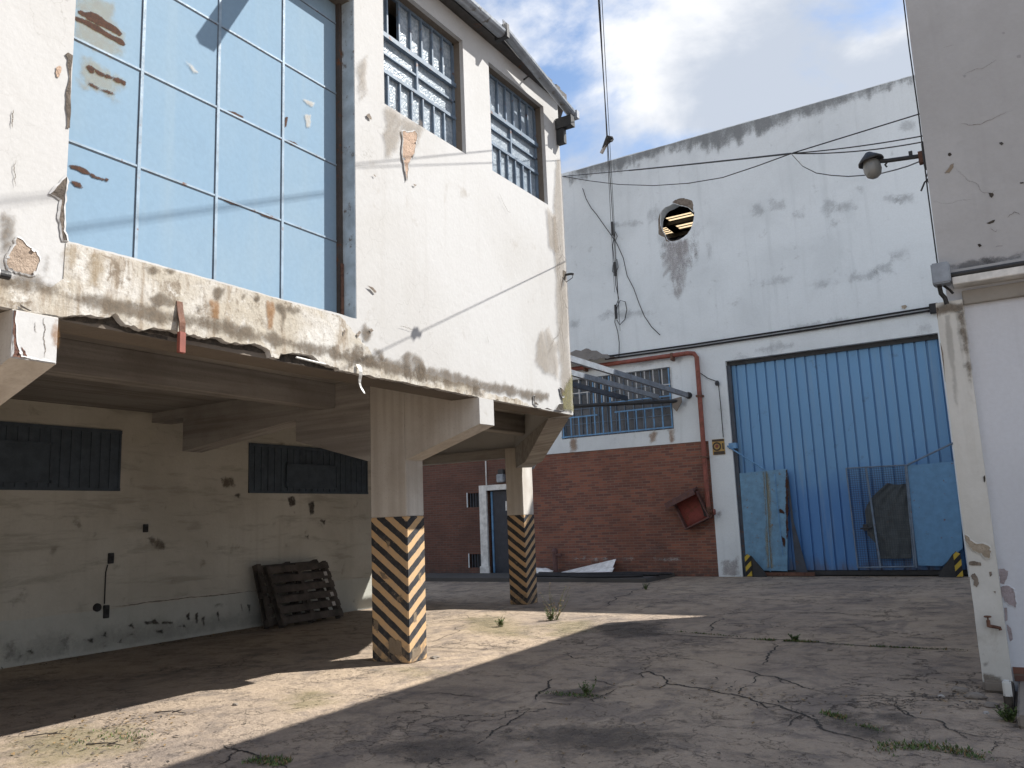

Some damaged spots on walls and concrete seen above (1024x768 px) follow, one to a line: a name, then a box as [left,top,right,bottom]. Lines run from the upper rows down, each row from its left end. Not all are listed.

rust [75,10,125,46]
peeling [56,53,73,128]
rust [87,65,126,95]
rust [69,165,109,188]
peeling [49,175,69,242]
spalling [4,236,41,277]
leakage [151,293,174,306]
spalling [11,304,265,363]
crack [486,679,552,739]
crack [631,668,874,743]
crack [872,695,1013,739]
crack [224,745,287,768]